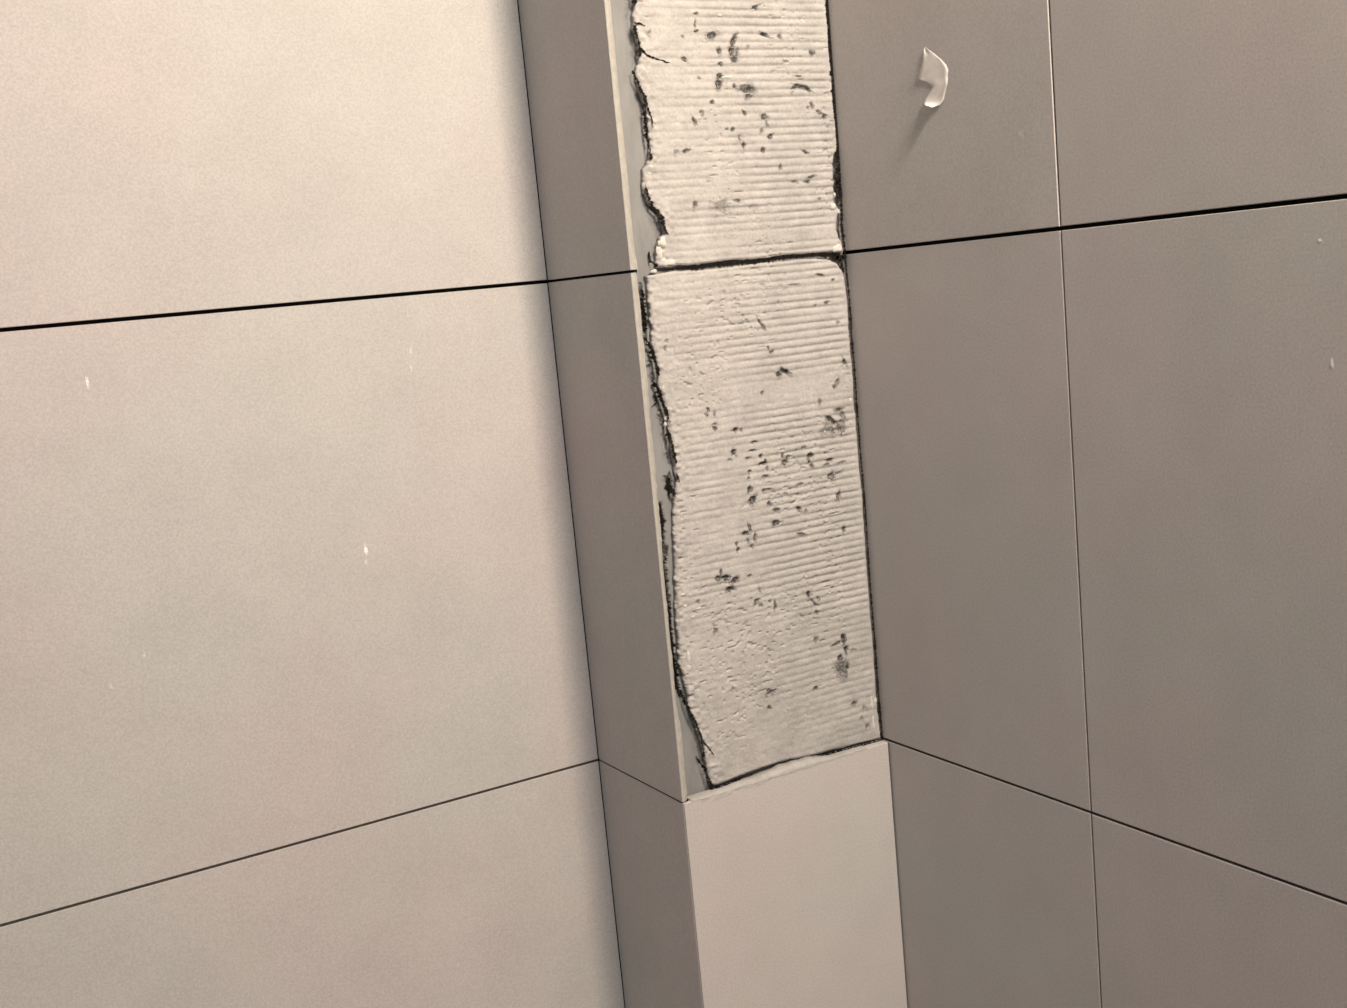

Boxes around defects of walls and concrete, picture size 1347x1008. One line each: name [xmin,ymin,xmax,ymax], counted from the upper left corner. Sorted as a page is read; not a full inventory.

spalling [682,12,754,124]
spalling [731,427,840,526]
spalling [833,634,849,676]